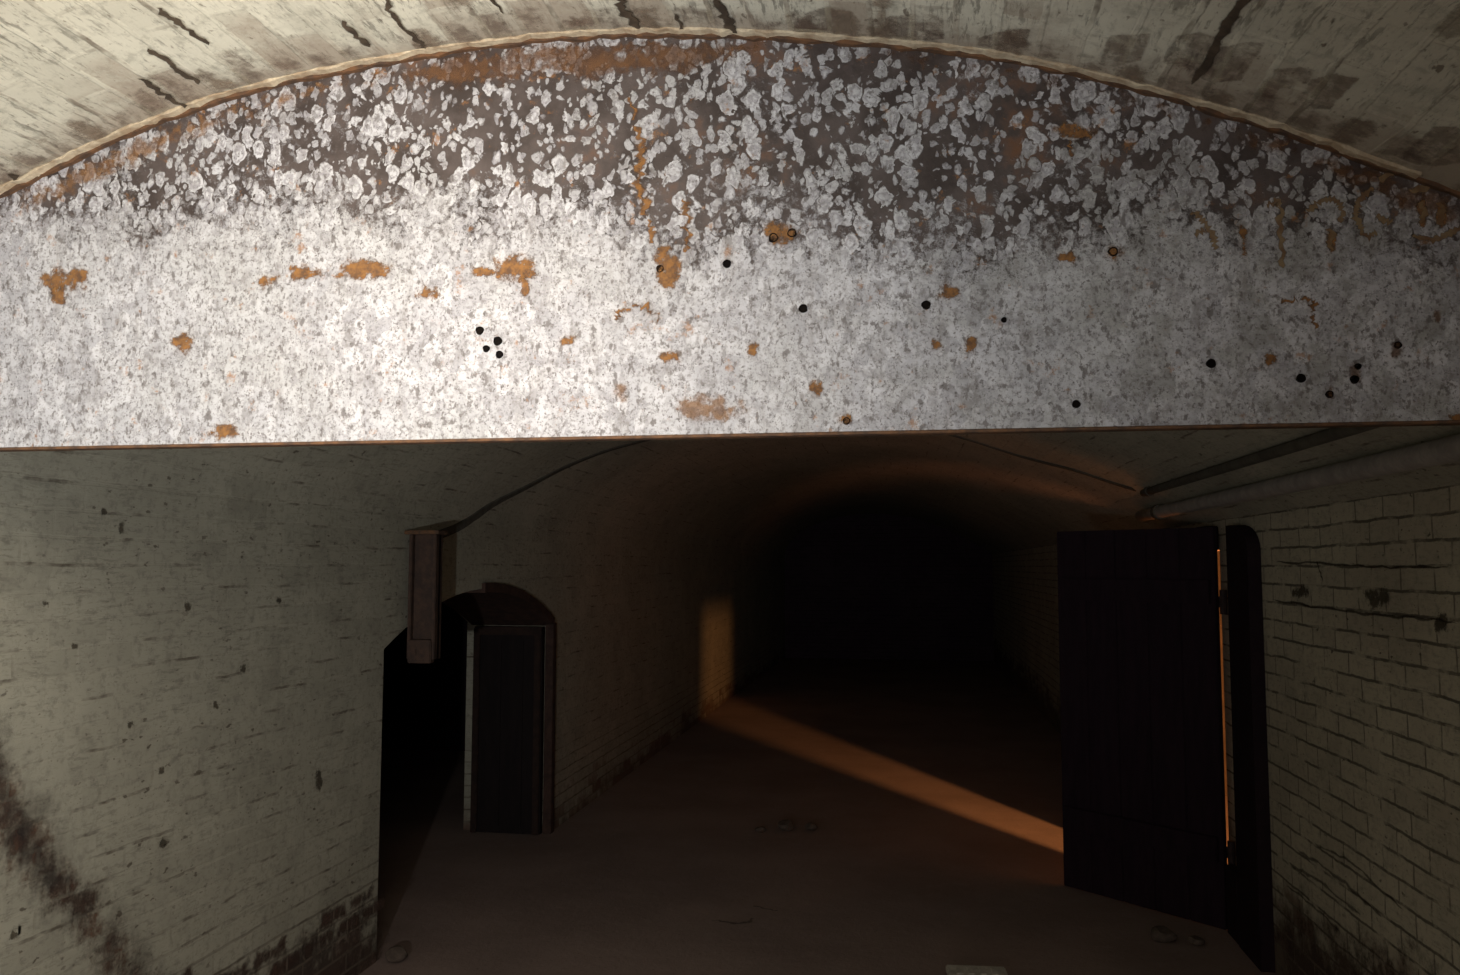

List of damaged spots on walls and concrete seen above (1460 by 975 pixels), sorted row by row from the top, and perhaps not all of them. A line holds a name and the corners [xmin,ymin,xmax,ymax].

crack [139,8,209,108]
crack [342,0,426,49]
crack [1192,0,1252,84]
corrosion [0,32,1460,228]
corrosion [627,97,693,288]
corrosion [40,268,88,304]
corrosion [258,258,392,287]
corrosion [472,254,537,296]
corrosion [172,332,193,356]
corrosion [207,424,239,441]
flaking render [0,767,140,975]
peeling [224,887,384,975]